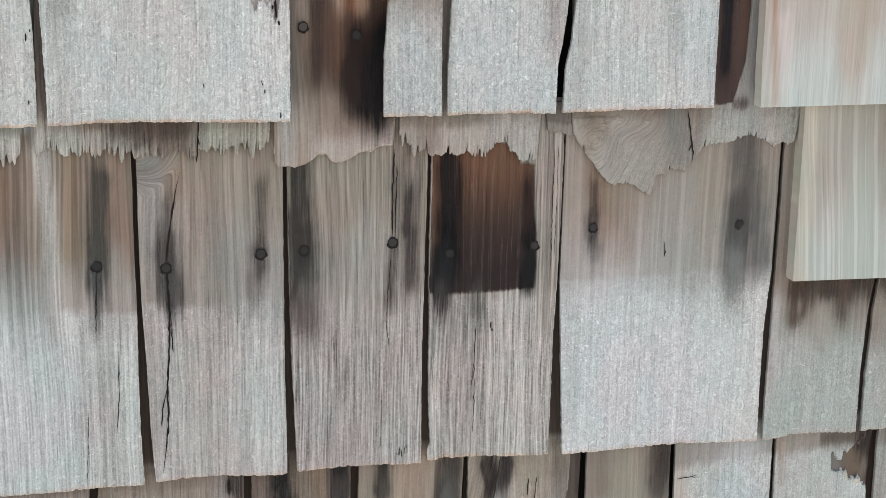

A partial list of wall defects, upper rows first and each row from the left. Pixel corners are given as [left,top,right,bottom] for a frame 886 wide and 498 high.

crack [194,122,202,162]
water stain [341,17,392,136]
water stain [429,142,536,313]
water stain [725,134,764,288]
crack [161,177,179,471]
spalling [831,437,868,485]